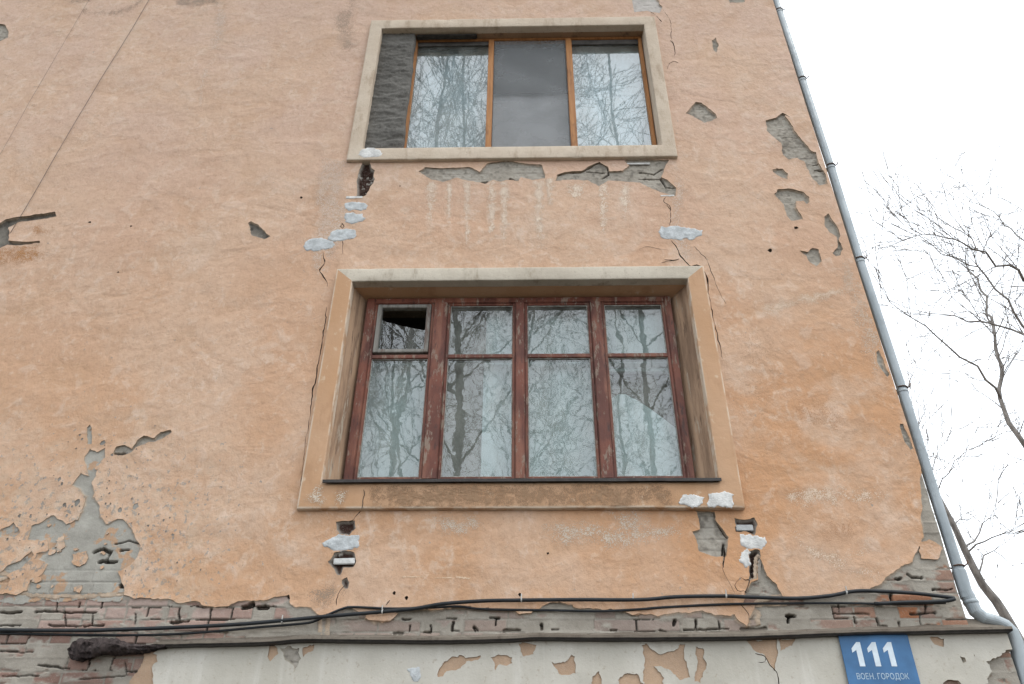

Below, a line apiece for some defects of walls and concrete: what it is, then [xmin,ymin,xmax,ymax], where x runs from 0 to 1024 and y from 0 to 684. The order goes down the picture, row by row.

flaking render [0,424,968,684]